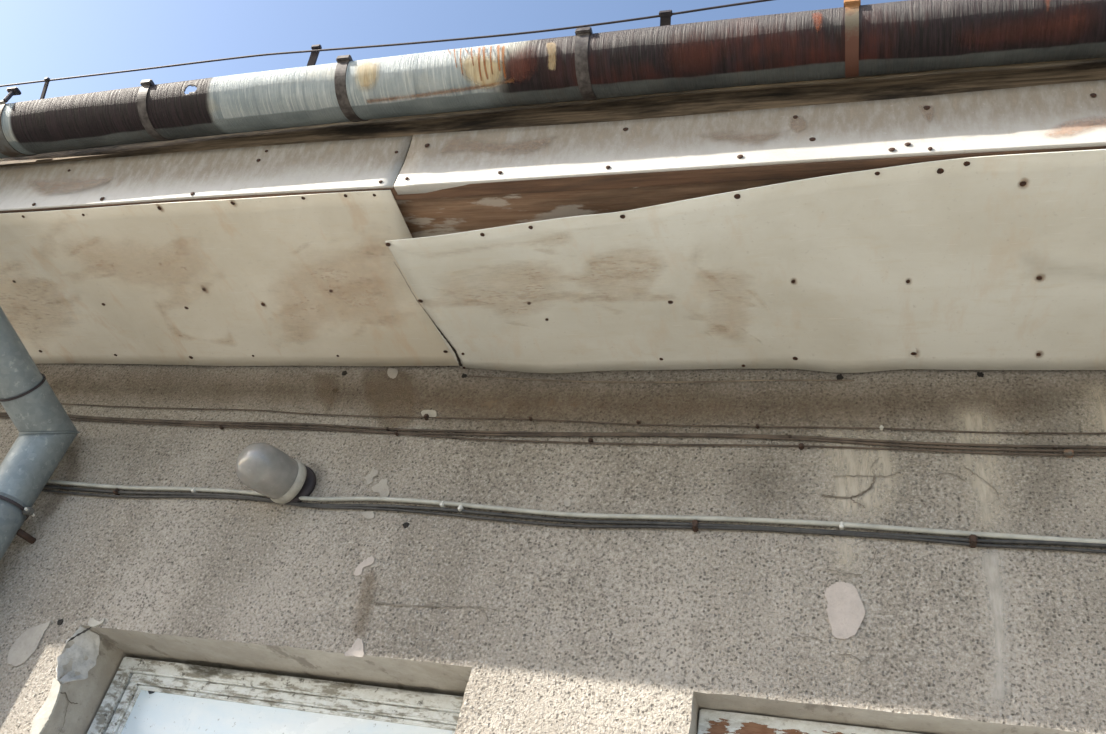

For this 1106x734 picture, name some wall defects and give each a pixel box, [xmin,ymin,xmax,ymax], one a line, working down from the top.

crack [822,457,999,508]
flaking render [824,581,865,640]
flaking render [7,619,63,667]
flaking render [30,618,105,734]
peeling [702,718,854,734]